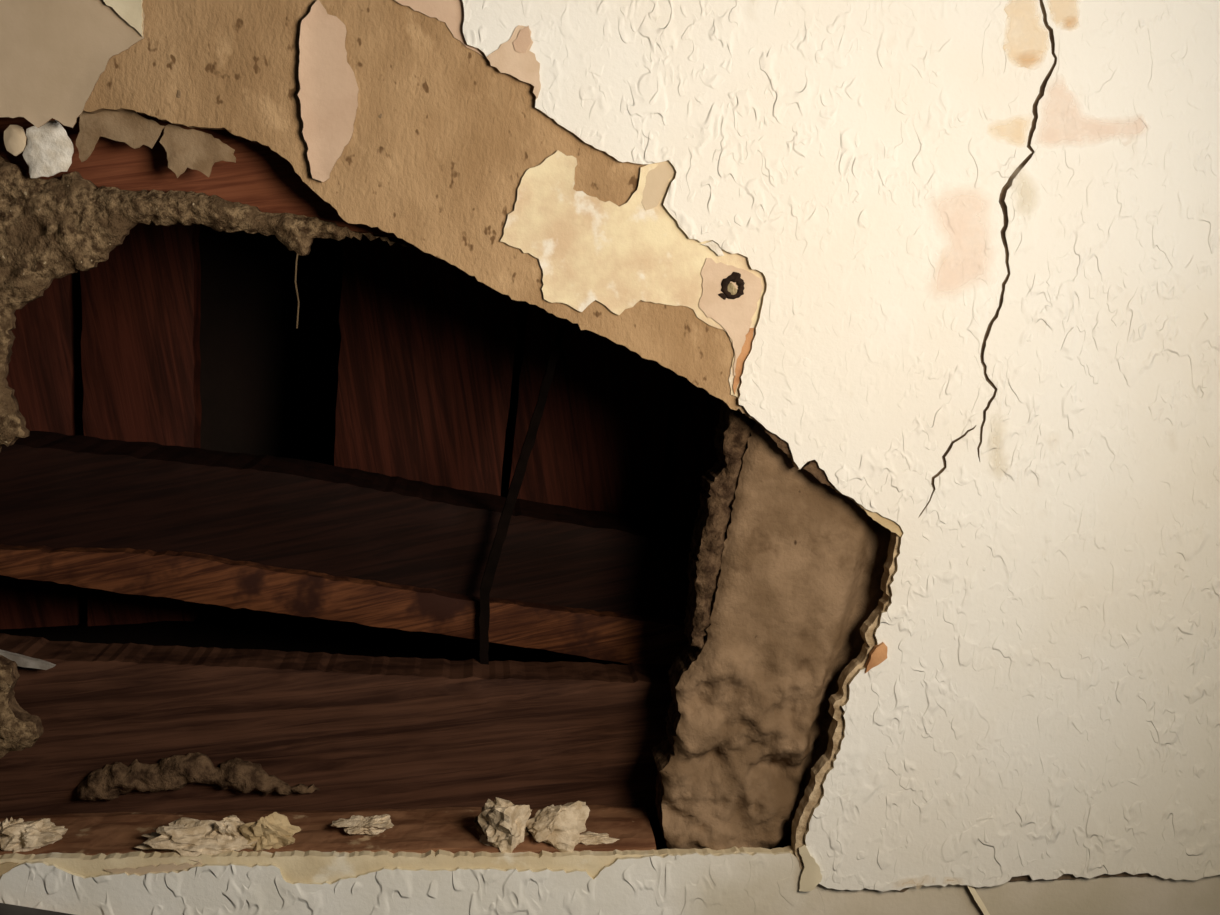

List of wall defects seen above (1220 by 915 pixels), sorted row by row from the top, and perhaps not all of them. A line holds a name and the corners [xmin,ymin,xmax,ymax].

peeling [0,0,145,178]
peeling [298,0,359,182]
peeling [395,0,541,99]
crack [919,0,1056,516]
peeling [0,150,902,883]